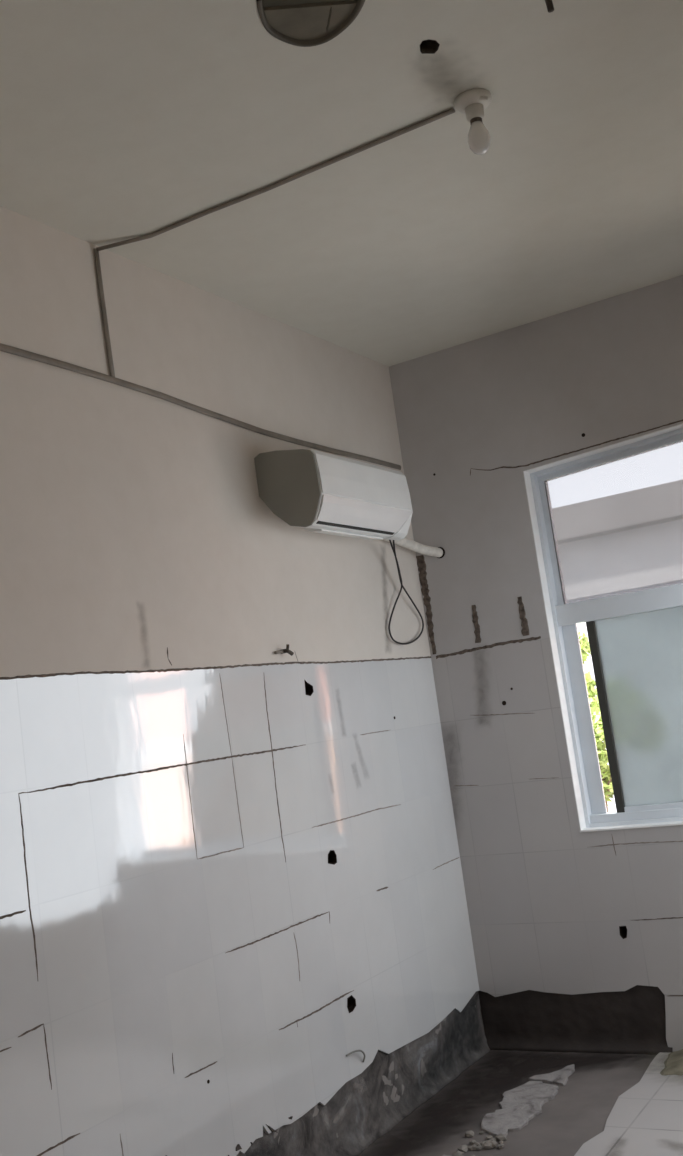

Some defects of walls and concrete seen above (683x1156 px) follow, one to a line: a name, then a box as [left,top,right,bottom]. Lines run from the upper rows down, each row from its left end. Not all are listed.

spalling [228,985,673,1156]